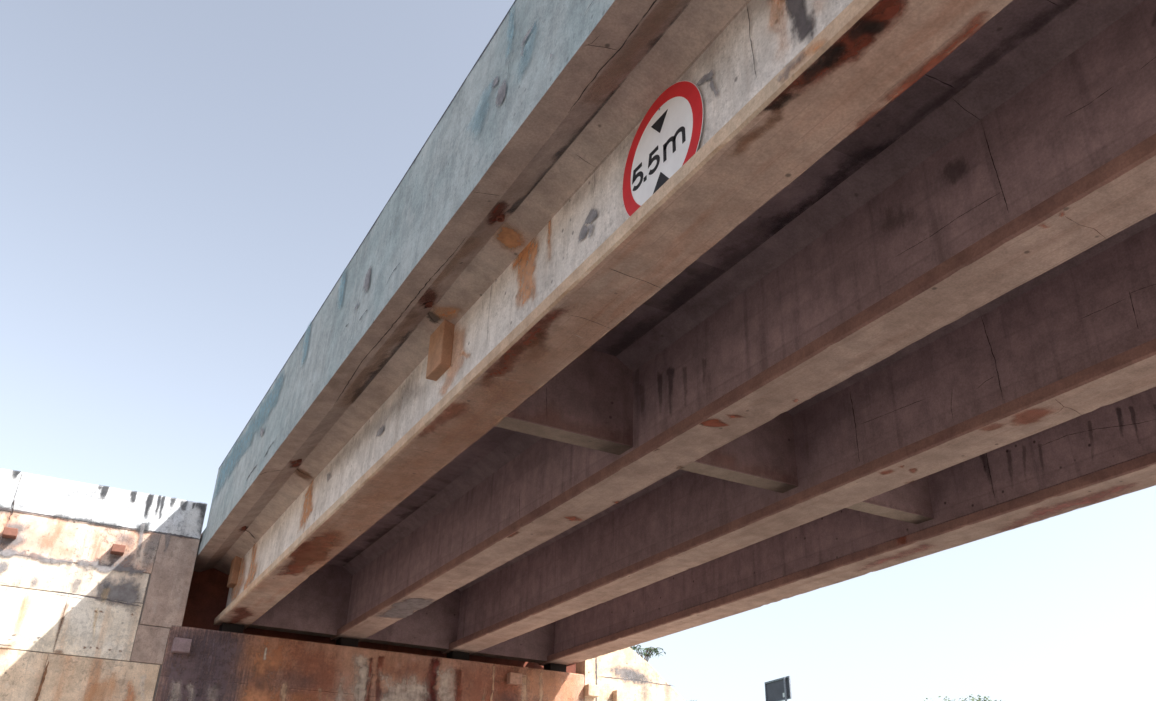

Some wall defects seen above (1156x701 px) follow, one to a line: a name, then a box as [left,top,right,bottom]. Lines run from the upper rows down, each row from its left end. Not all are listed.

corrosion [735,0,905,153]
corrosion [888,14,982,101]
corrosion [488,203,551,304]
corrosion [1013,409,1048,423]
water stain [0,491,207,606]
corrosion [279,532,340,576]
corrosion [363,657,384,701]
corrosion [424,658,440,701]
corrosion [454,670,462,701]